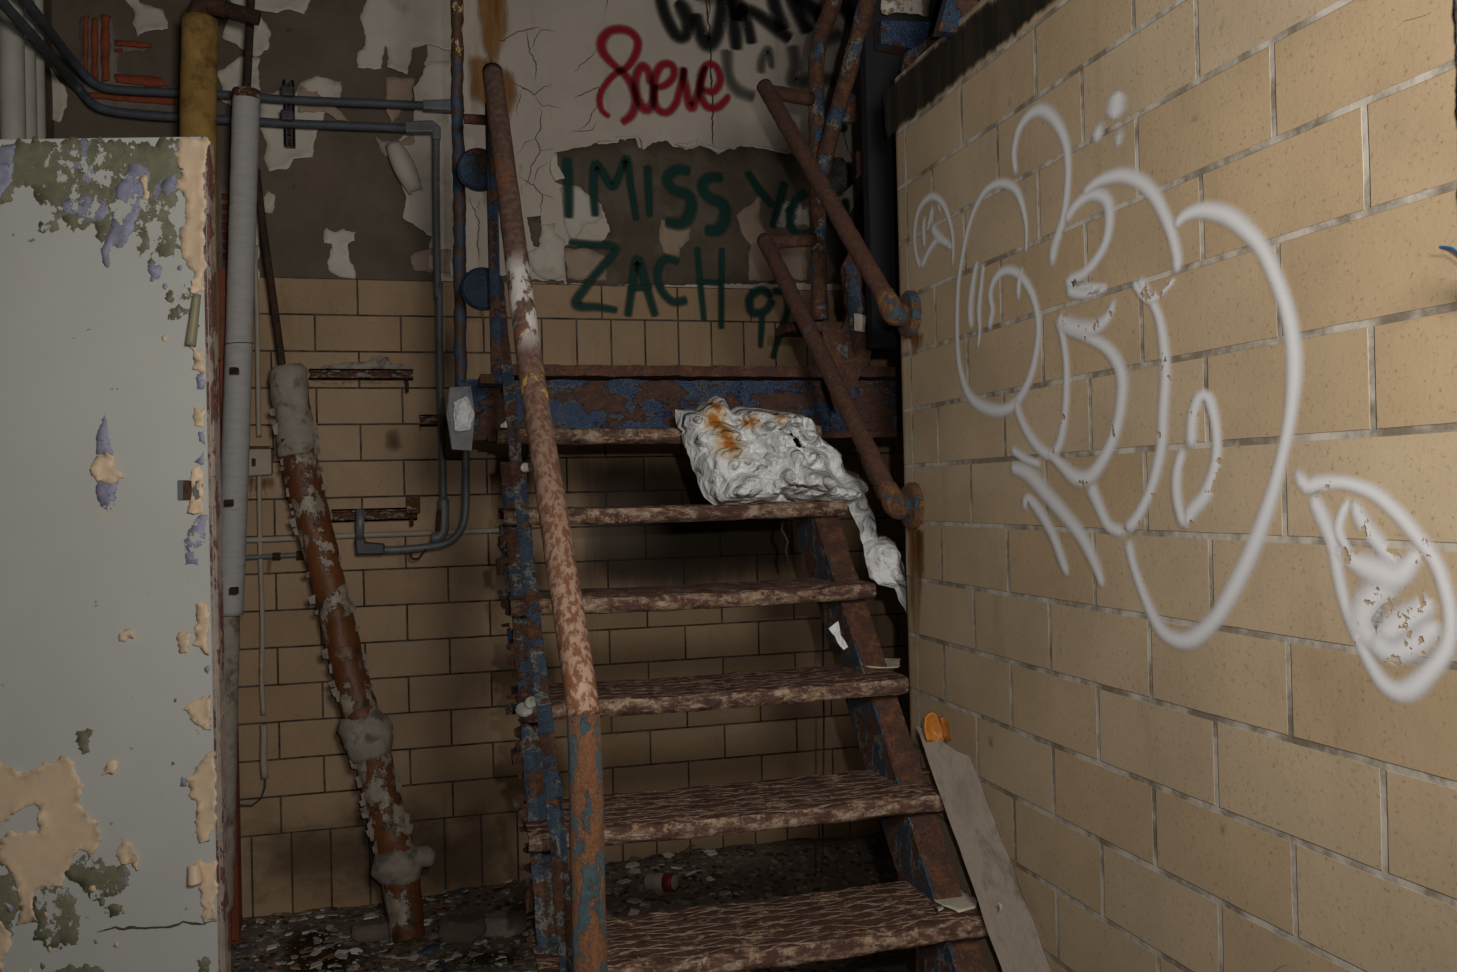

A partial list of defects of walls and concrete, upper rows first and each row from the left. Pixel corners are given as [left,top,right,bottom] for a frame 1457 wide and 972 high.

peeling [218,0,348,172]
peeling [357,0,467,277]
flaking render [217,179,229,270]
peeling [256,191,275,281]
peeling [323,228,356,279]
flaking render [527,136,867,353]
corrosion [909,530,923,595]